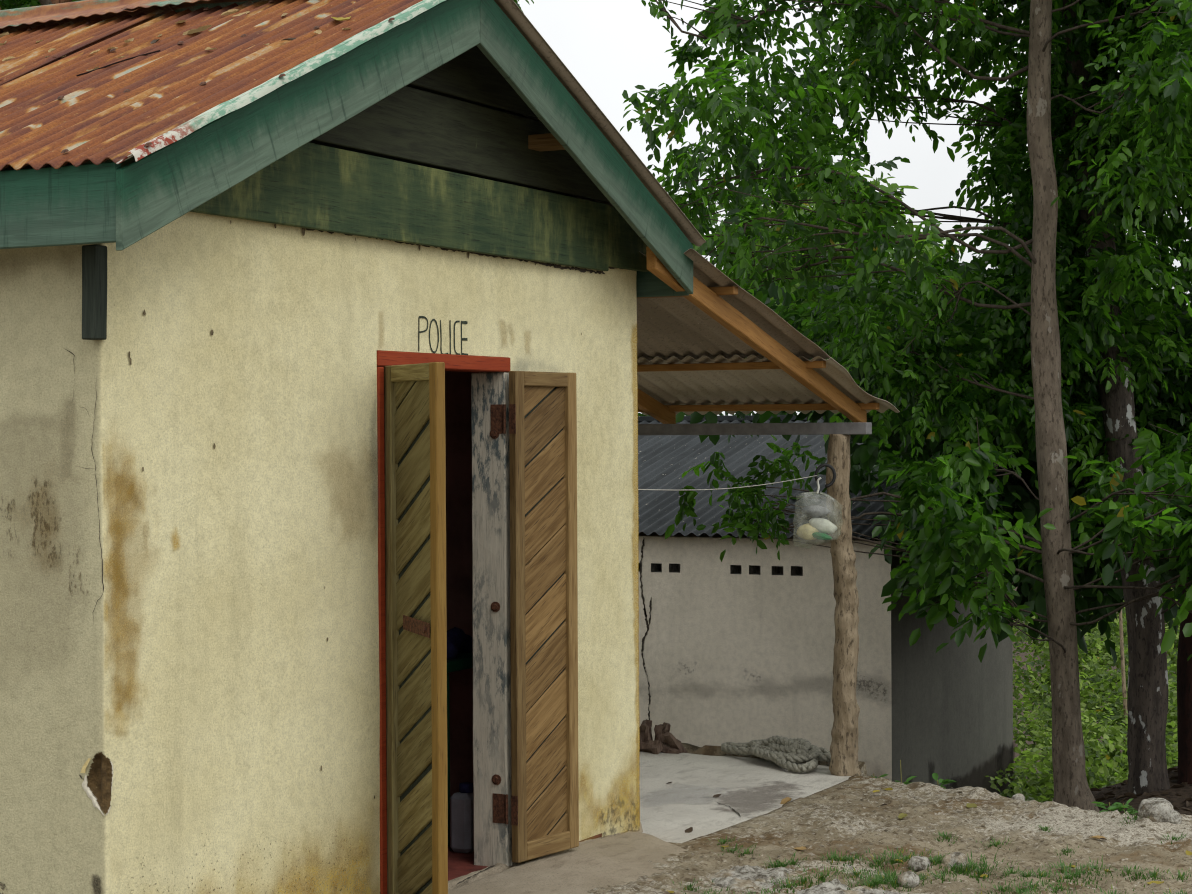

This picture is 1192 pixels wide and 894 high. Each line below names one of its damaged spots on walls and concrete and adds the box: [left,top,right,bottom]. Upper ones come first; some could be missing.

crack [72,377,104,621]
spalling [79,752,113,816]